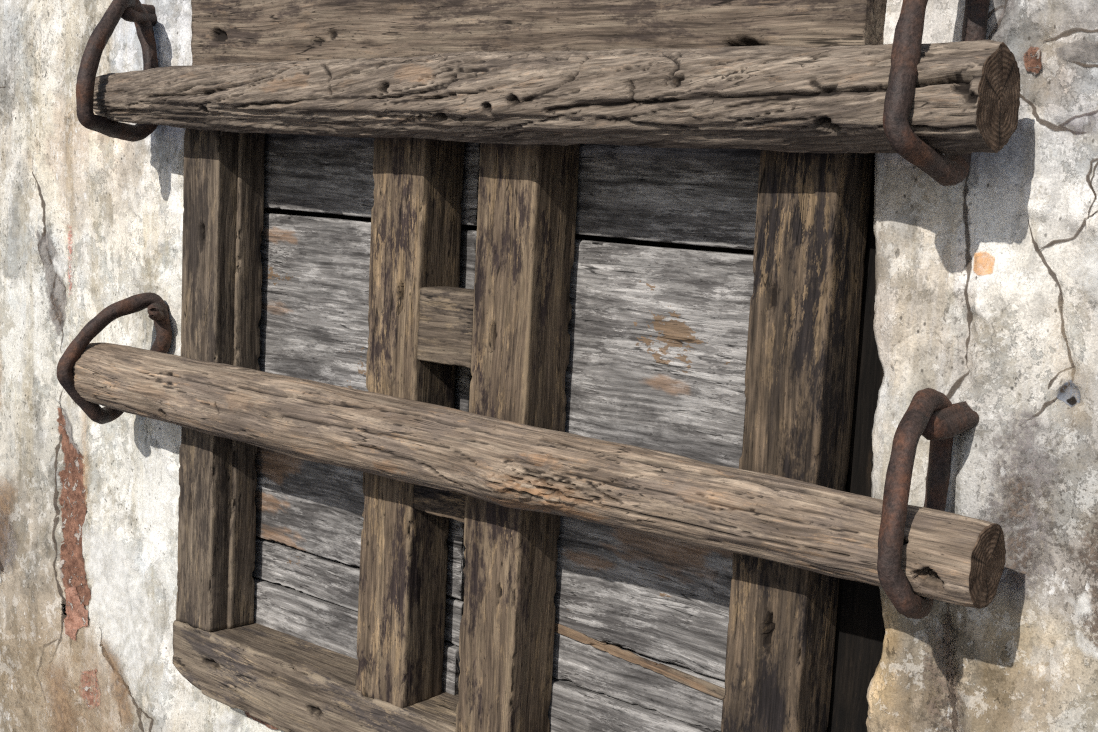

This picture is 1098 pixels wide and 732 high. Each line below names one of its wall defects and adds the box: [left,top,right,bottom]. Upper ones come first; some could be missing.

crack [988,0,1008,40]
spalling [1023,46,1042,75]
crack [1043,28,1098,67]
spalling [1057,40,1098,62]
crack [1020,94,1098,134]
crack [1020,158,1098,426]
flaking render [57,405,160,688]
spalling [79,669,101,709]
flaking render [215,710,278,732]